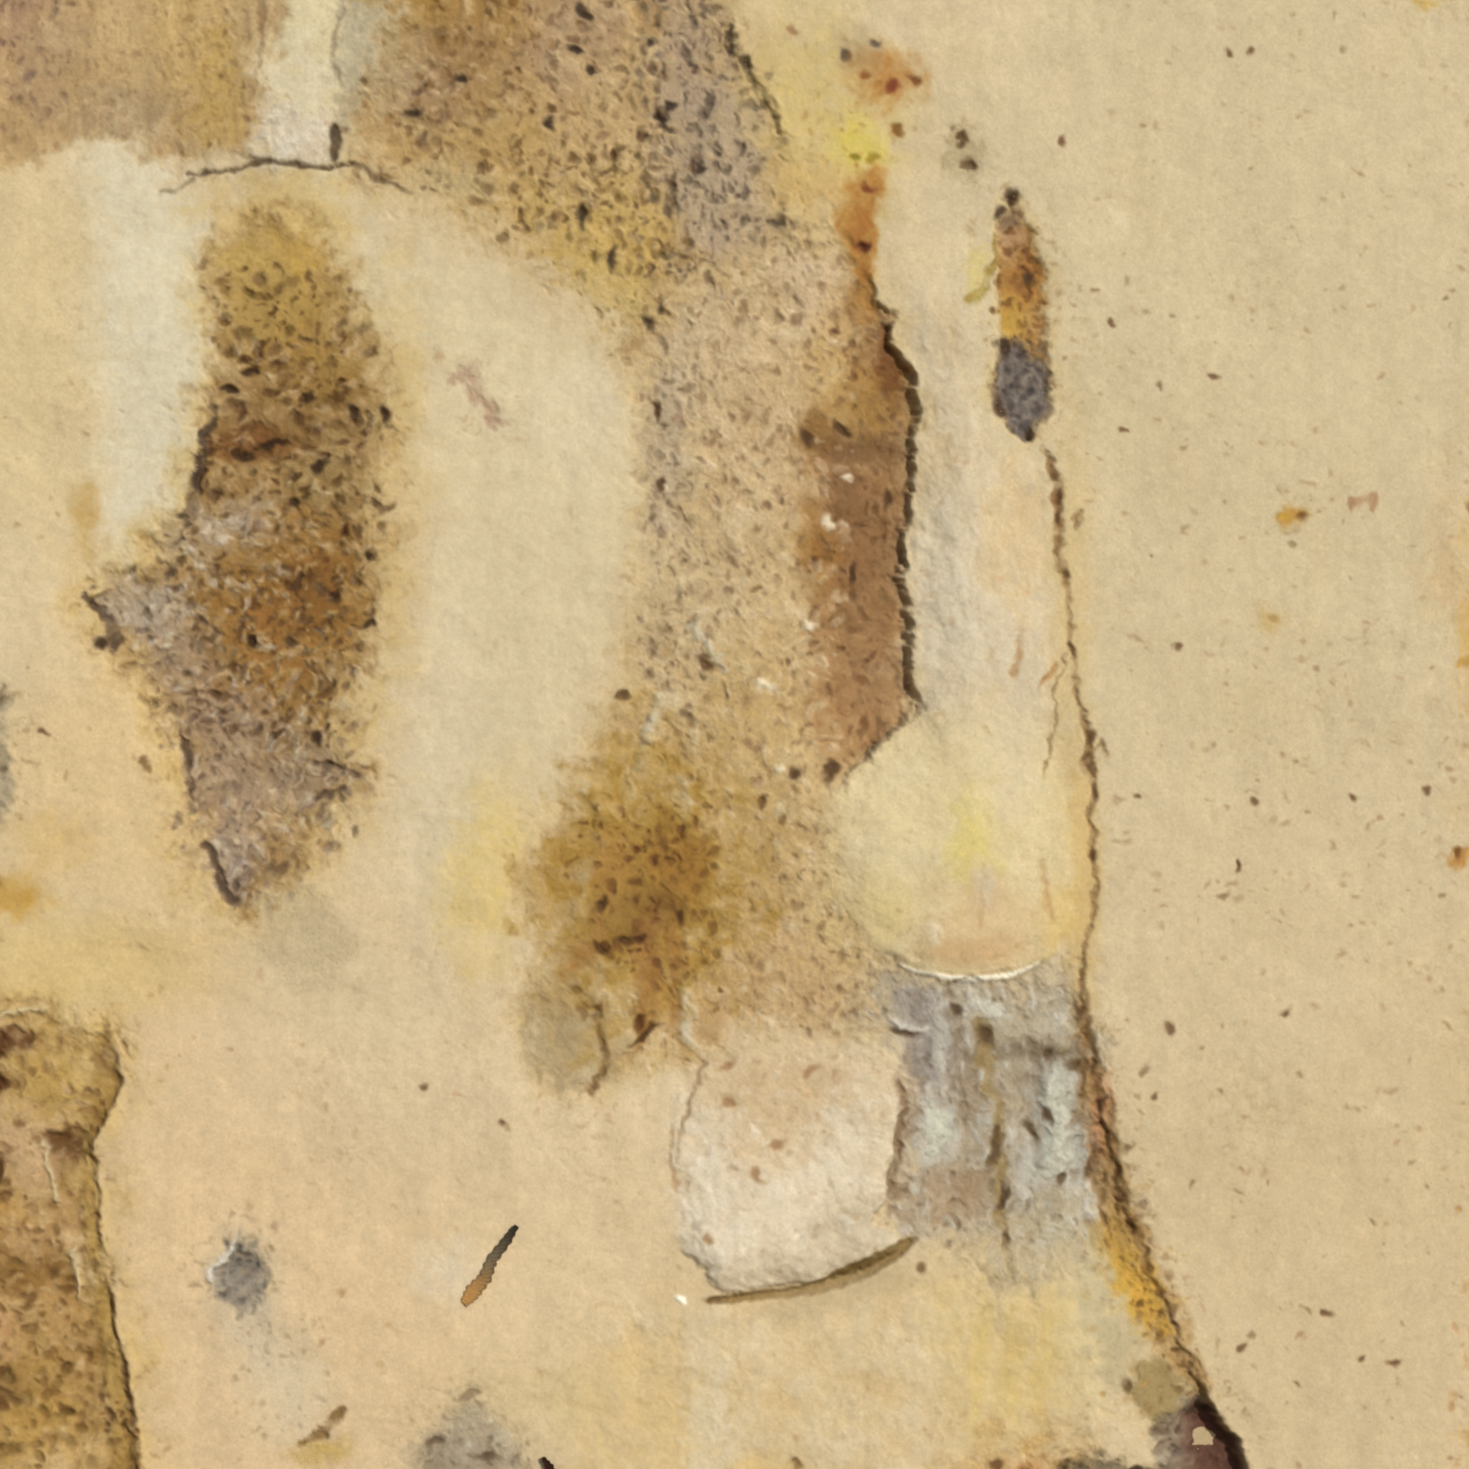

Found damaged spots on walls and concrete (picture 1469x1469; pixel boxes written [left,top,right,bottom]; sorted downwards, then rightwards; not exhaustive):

crack [160,151,415,196]
spalling [0,0,808,362]
corrosion [732,3,934,282]
spalling [940,116,988,186]
spalling [80,187,406,996]
spalling [504,195,1246,1469]
crack [1042,449,1247,1469]
spalling [0,992,143,1469]
peeling [207,1232,272,1321]
peeling [462,1225,519,1307]
peeling [281,1407,356,1469]
peeling [399,1382,555,1469]